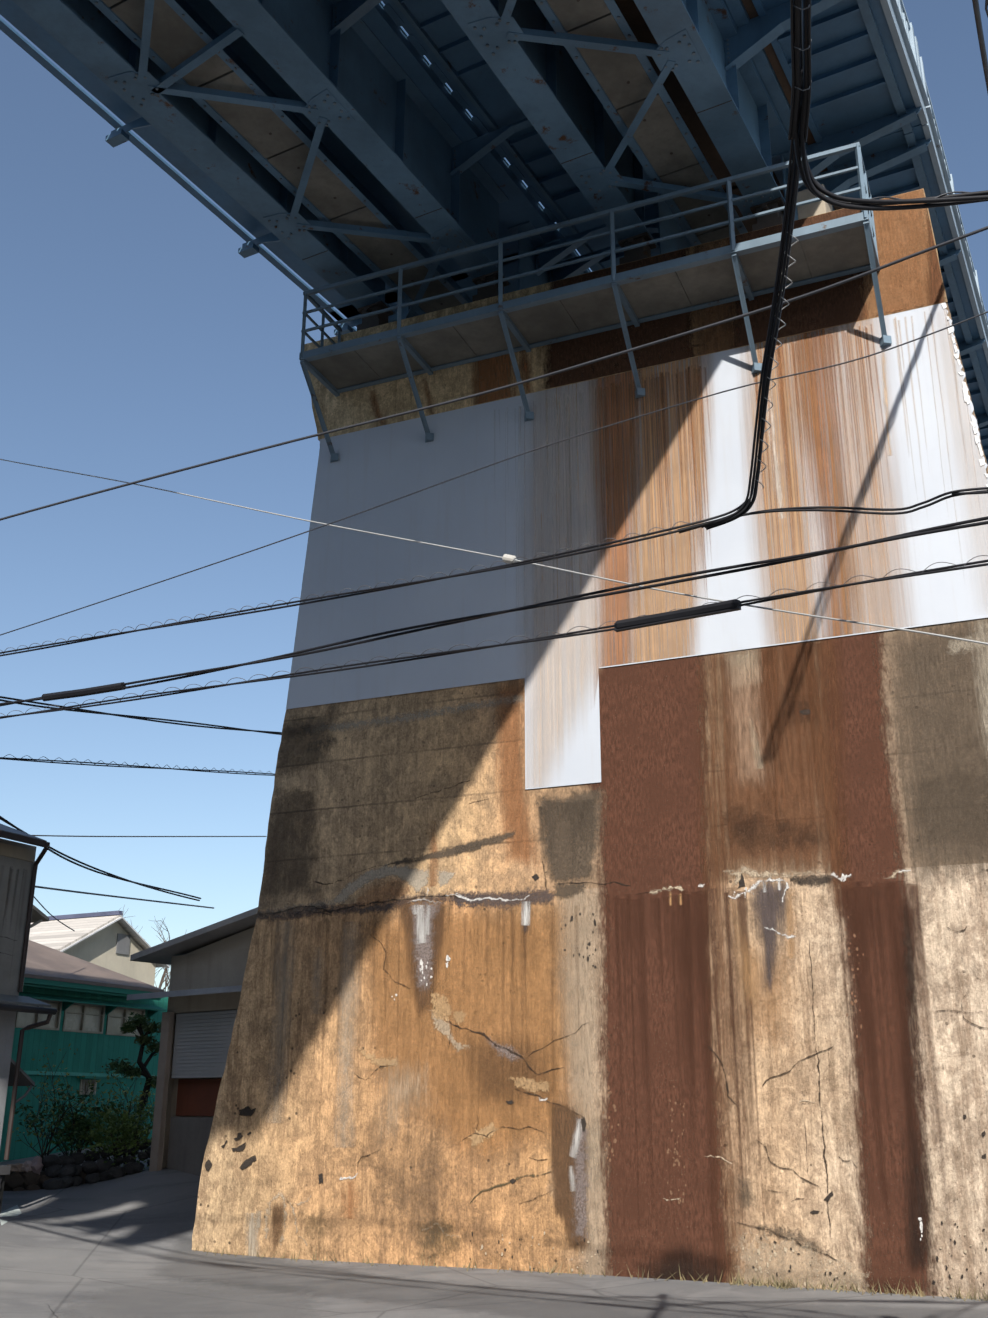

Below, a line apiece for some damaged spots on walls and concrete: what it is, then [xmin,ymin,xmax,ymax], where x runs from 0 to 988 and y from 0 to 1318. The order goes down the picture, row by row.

corrosion [474,190,945,1296]
leakage [333,864,530,1012]
crack [449,1021,589,1203]
leakage [532,790,601,1248]
crack [708,1046,734,1103]
leakage [729,878,796,986]
crack [737,943,857,1261]